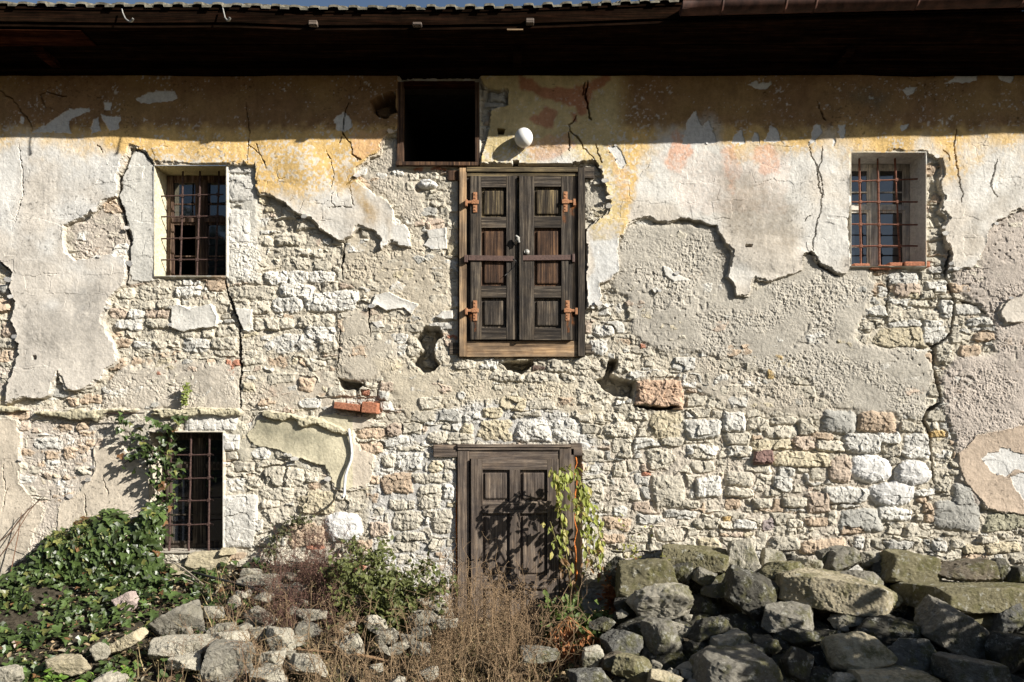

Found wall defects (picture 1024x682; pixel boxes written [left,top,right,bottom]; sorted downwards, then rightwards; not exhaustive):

spalling [0,261,26,408]
spalling [65,196,133,267]
crack [226,287,244,406]
spalling [103,94,459,411]
crack [568,81,602,173]
spalling [585,165,614,231]
spalling [591,154,1024,435]
crack [803,144,838,276]
crack [883,277,891,313]
crack [921,243,985,481]
crack [943,129,964,203]
spalling [246,441,333,513]